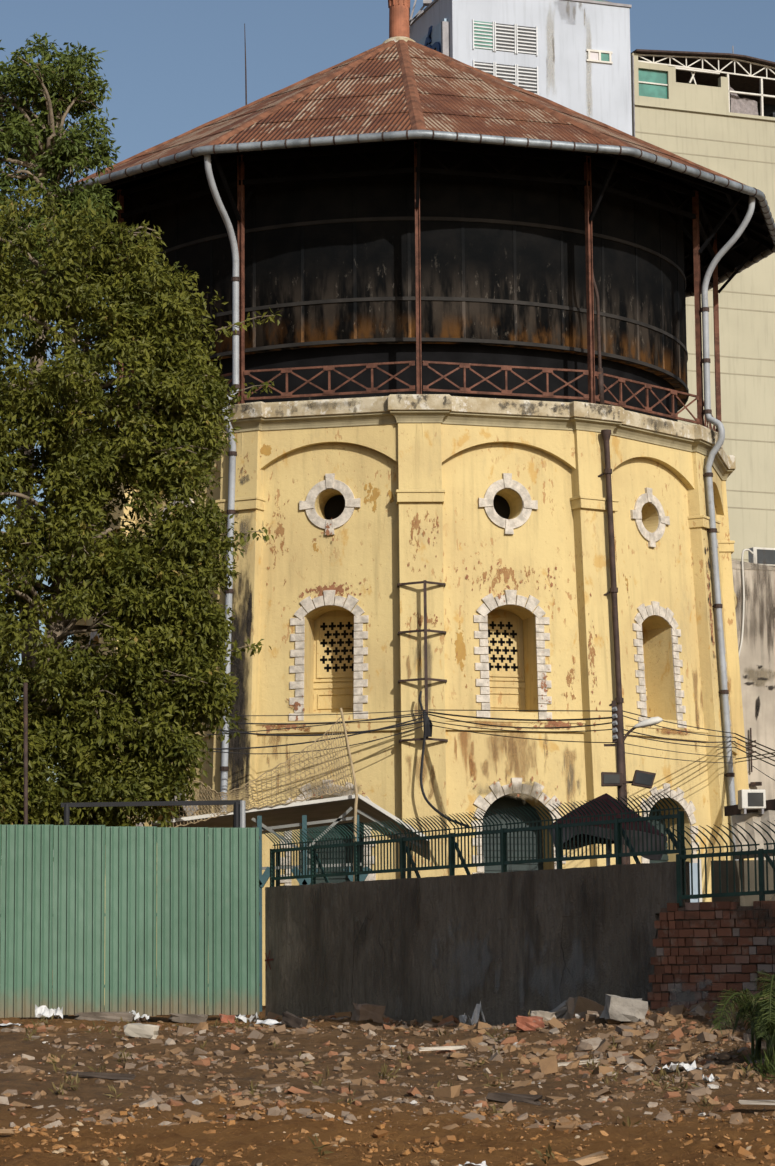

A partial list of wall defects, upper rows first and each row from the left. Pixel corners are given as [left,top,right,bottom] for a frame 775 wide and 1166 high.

peeling [358,482,394,513]
peeling [266,495,291,585]
spalling [407,510,439,571]
peeling [293,582,369,602]
peeling [456,561,558,602]
damp [228,574,252,795]
damp [743,666,774,690]